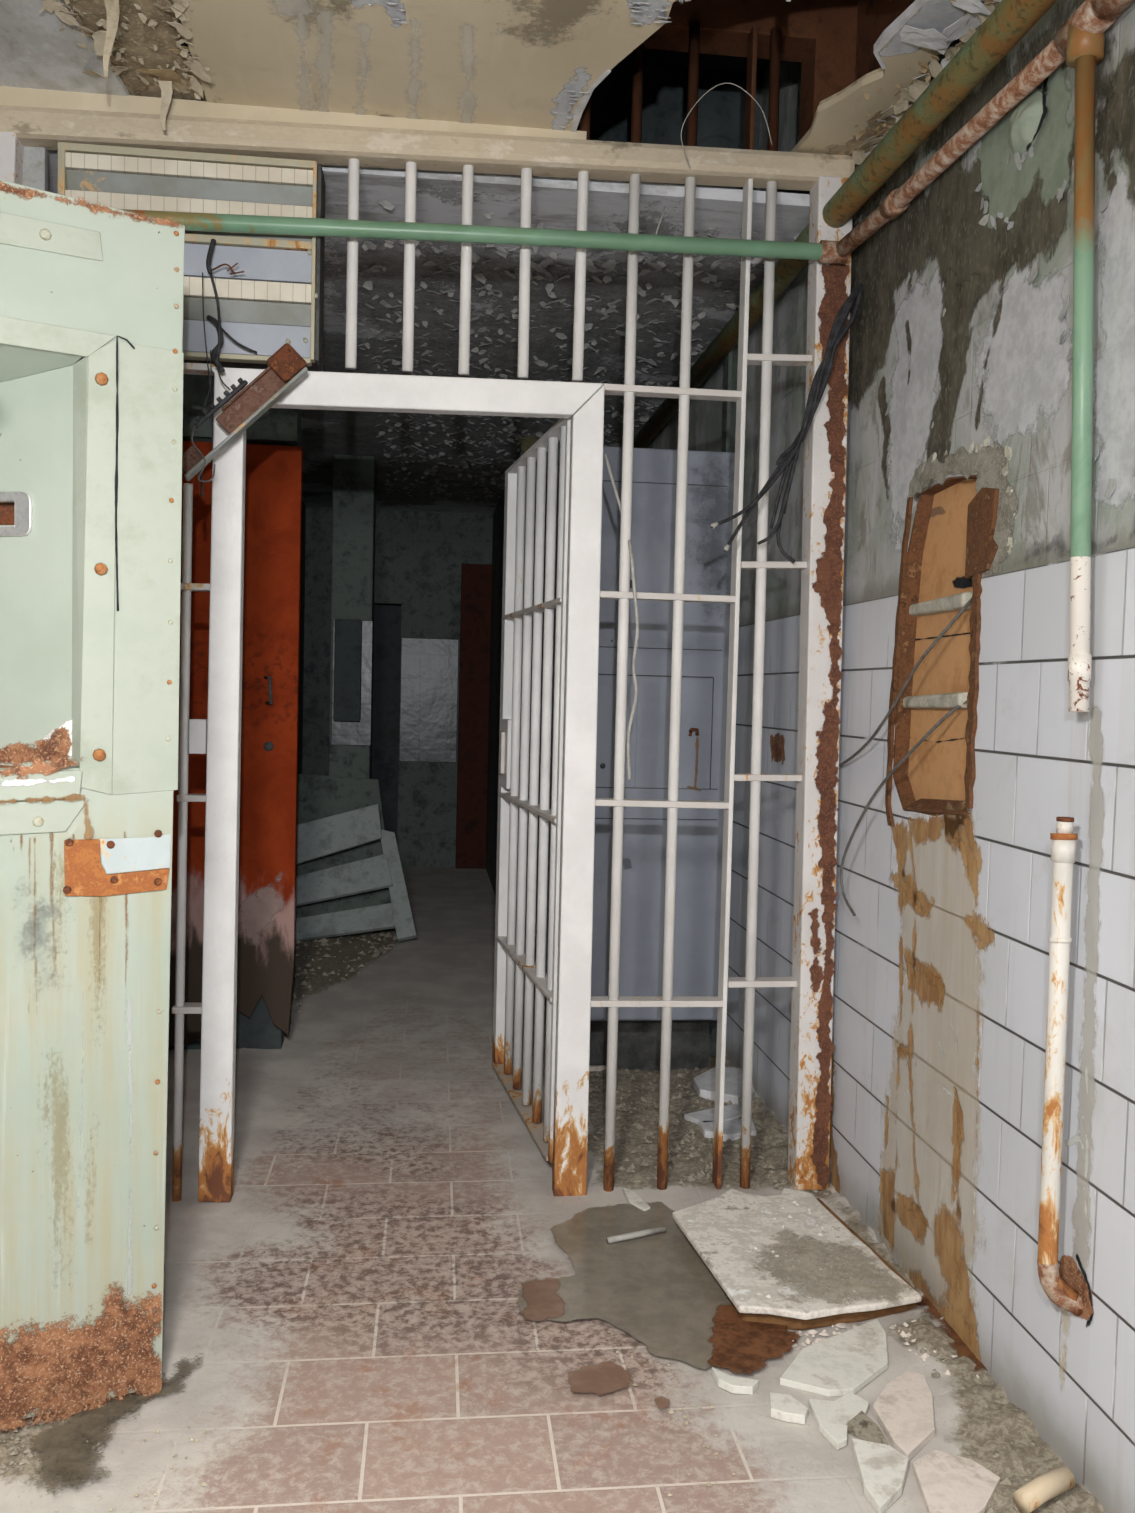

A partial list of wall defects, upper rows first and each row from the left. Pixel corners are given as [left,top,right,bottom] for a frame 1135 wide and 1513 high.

peeling [37,0,224,131]
peeling [550,67,591,131]
peeling [973,65,1075,230]
peeling [1092,166,1135,507]
peeling [885,259,1073,578]
rust [11,832,53,928]
rust [0,727,83,780]
rust [0,794,93,840]
rust [808,264,850,1193]
rust [879,497,995,1371]
rust [0,1283,162,1433]
rust [708,1304,800,1374]